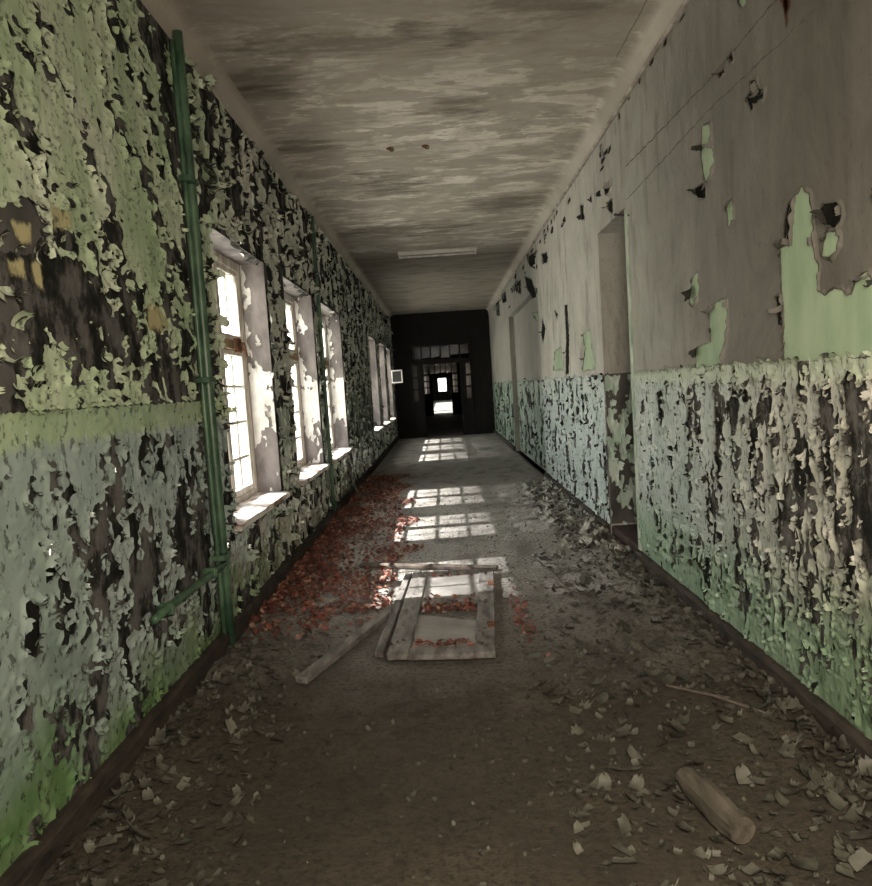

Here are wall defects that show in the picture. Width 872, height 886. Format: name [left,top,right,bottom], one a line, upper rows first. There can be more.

peeling [0,0,398,877]
peeling [494,142,615,317]
peeling [492,182,872,745]
peeling [686,120,716,201]